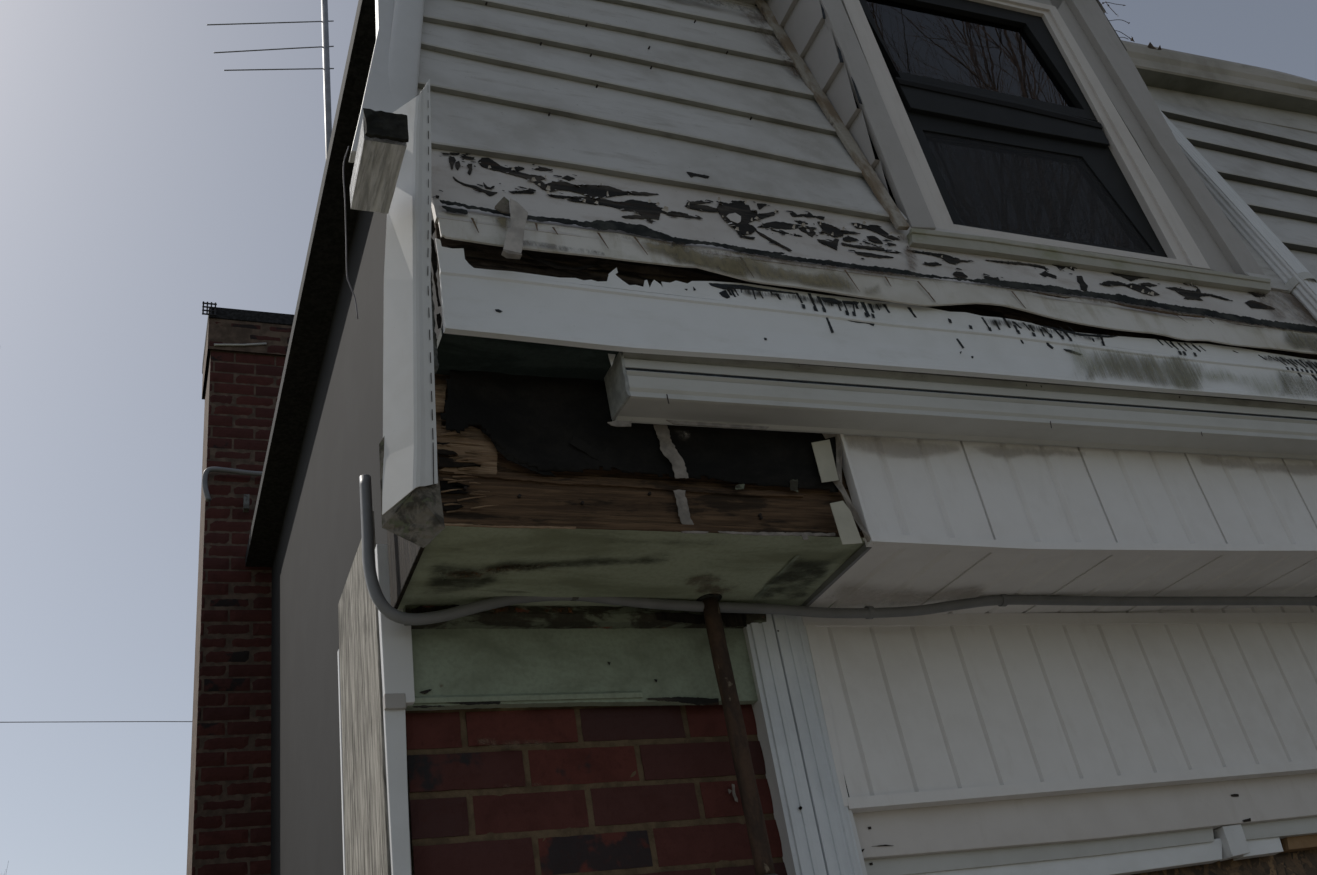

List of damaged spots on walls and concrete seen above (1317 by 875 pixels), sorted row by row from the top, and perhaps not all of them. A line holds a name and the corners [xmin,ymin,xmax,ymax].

peeling [440,152,1275,318]
water stain [969,317,1206,387]
water stain [1259,293,1317,397]
peeling [681,531,835,540]
water stain [430,559,653,587]